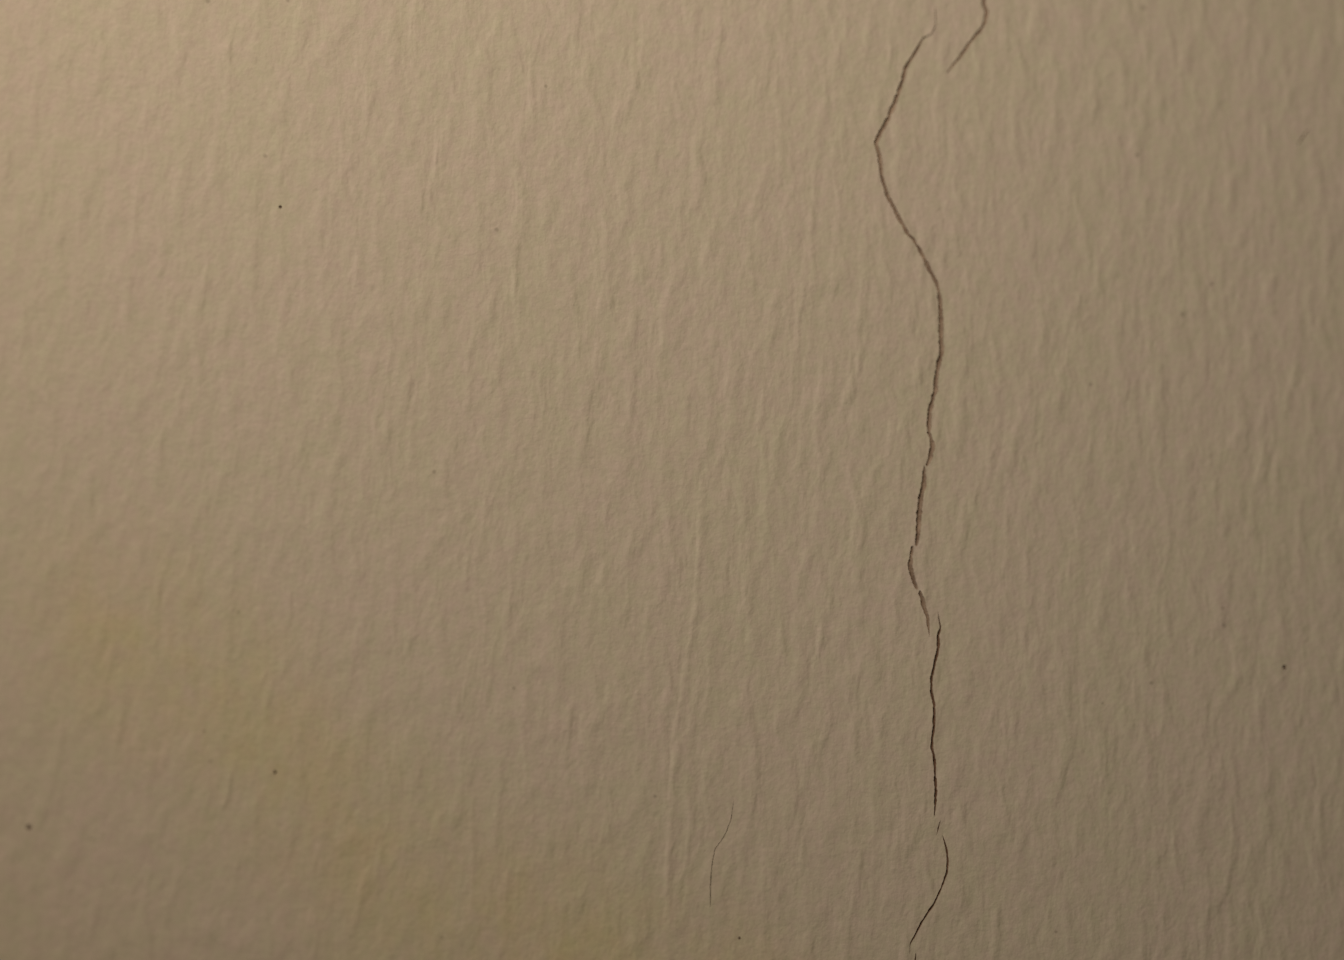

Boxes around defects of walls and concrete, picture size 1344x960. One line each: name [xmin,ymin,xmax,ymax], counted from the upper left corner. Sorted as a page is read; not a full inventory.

crack [874,6,949,960]
crack [947,0,989,73]